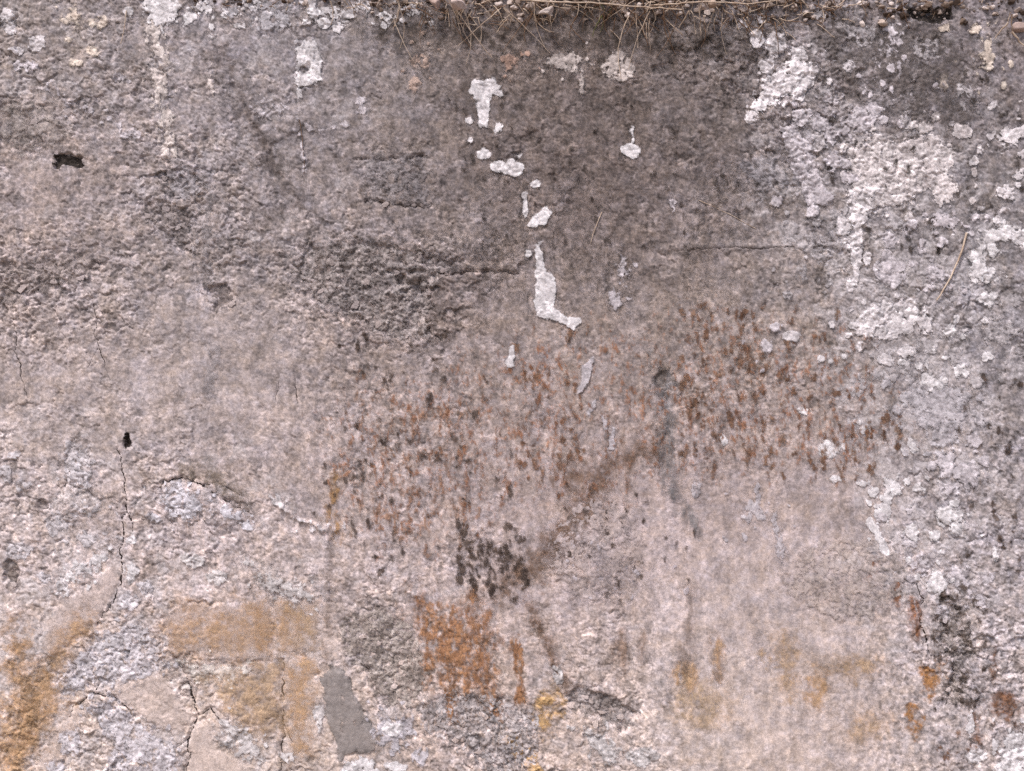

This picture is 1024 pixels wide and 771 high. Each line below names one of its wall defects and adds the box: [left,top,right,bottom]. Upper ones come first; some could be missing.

leakage [810,13,1011,173]
crack [97,448,133,625]
leakage [34,439,254,771]
corrosion [327,454,350,534]
corrosion [342,346,580,558]
leakage [451,498,530,604]
corrosion [414,588,567,730]
corrosion [497,340,763,596]
leakage [658,301,855,562]
corrosion [776,387,876,464]
leakage [792,373,903,483]
leakage [969,486,1021,561]